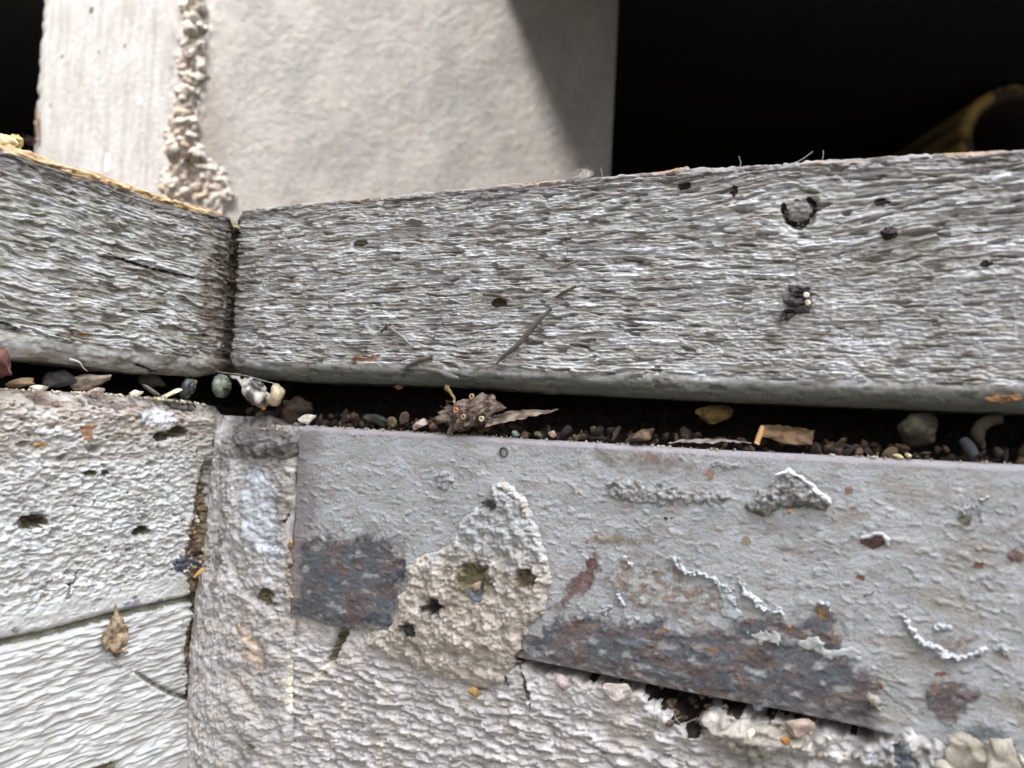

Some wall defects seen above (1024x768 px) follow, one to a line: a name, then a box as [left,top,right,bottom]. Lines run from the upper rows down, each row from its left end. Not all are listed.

crack [109,253,216,282]
spalling [479,499,495,511]
corrosion [297,533,406,629]
spalling [418,600,442,616]
peeling [602,554,785,620]
corrosion [530,533,883,716]
peeling [899,613,1009,663]